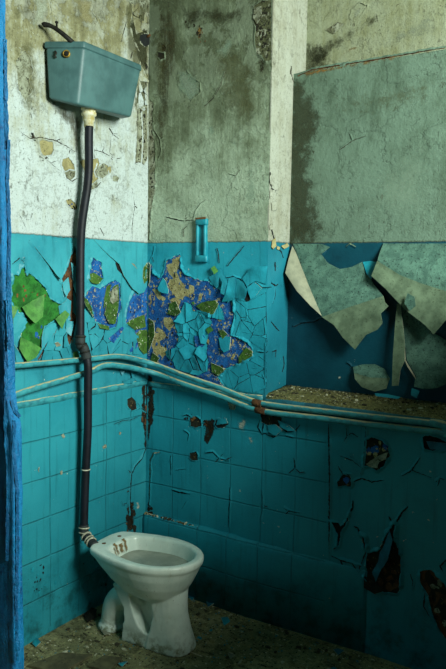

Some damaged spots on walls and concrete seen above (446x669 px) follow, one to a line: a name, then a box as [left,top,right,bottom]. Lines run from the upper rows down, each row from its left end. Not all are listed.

spalling [38,139,54,159]
spalling [62,156,85,184]
peeling [85,0,272,394]
damp [289,82,322,245]
peeling [11,240,79,362]
spalling [182,413,203,440]
peeling [336,434,392,489]
peeling [327,500,408,596]
peeling [416,560,446,640]